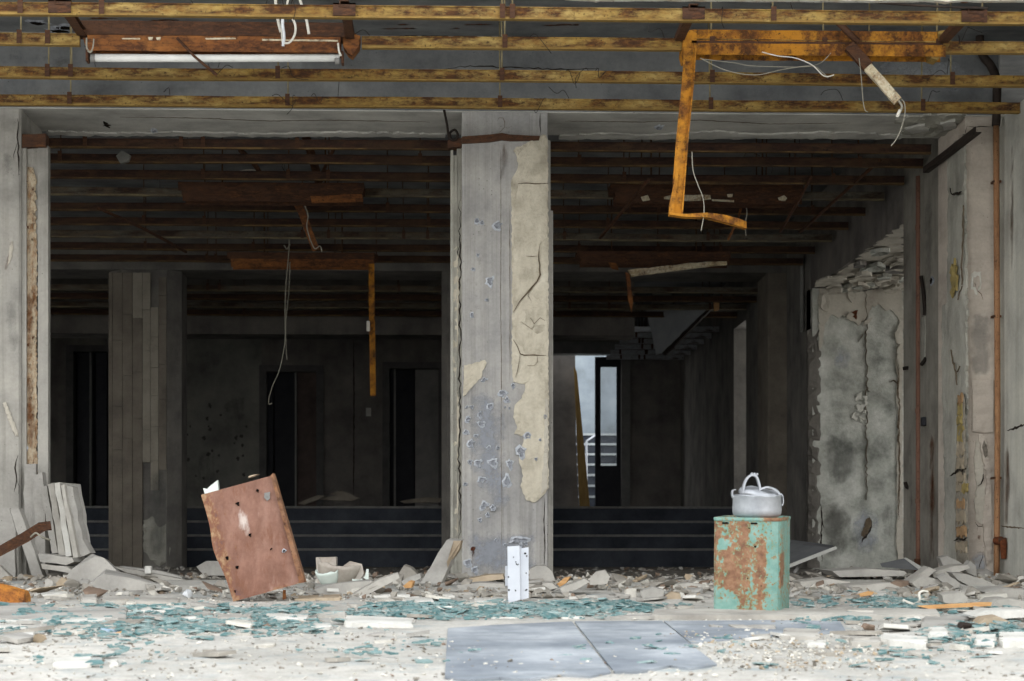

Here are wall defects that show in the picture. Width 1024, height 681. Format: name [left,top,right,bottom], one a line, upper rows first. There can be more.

rust [27,167,38,474]
crack [500,207,543,417]
flaking render [462,113,993,573]
crack [858,291,901,520]
spalling [447,541,478,575]